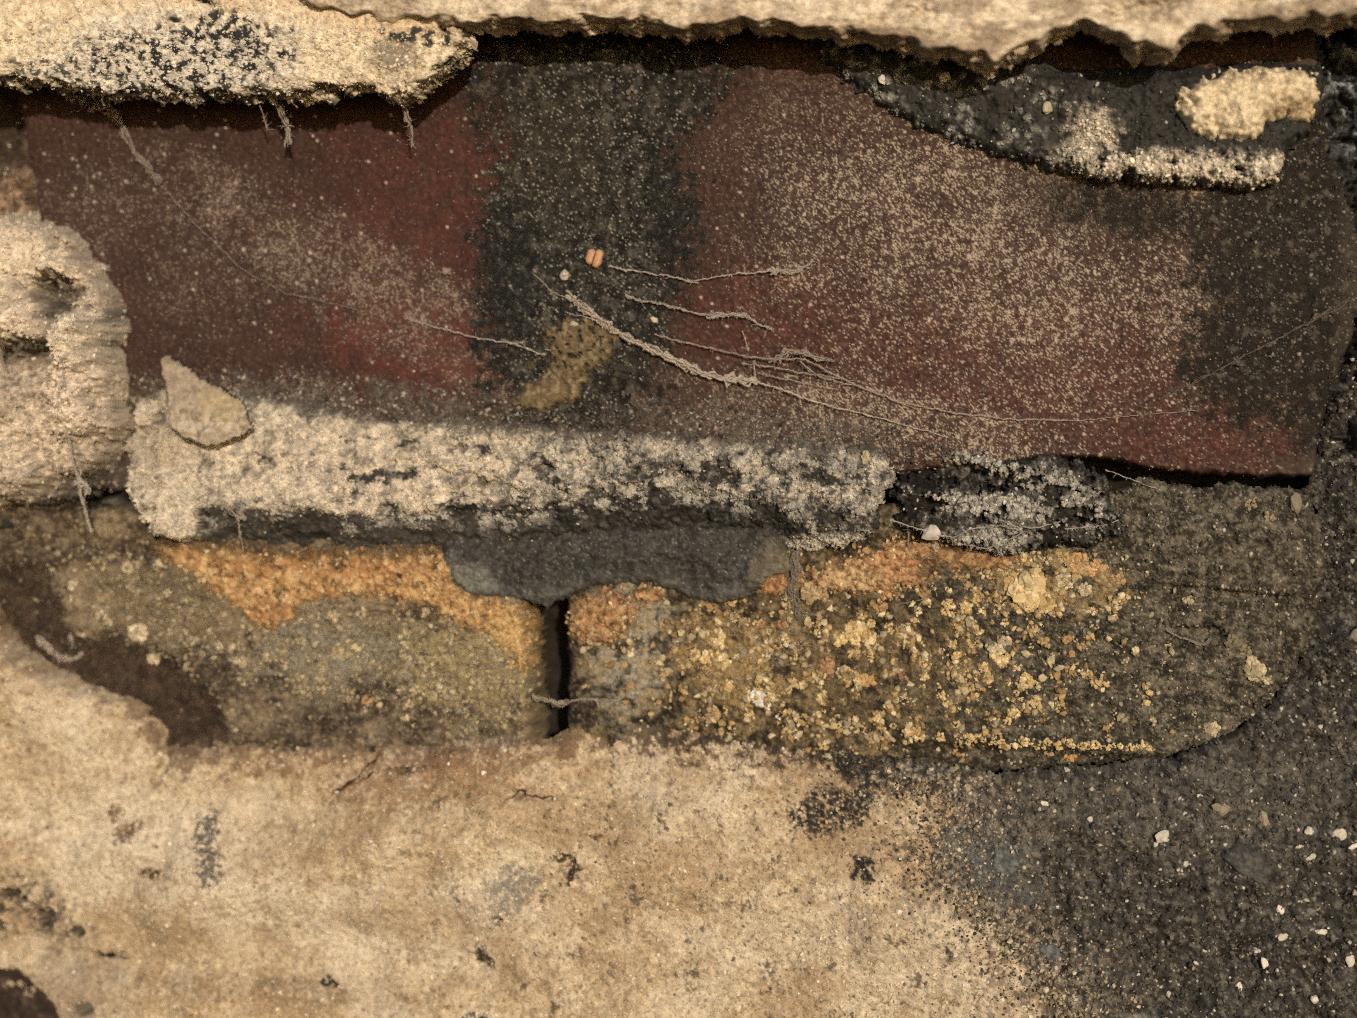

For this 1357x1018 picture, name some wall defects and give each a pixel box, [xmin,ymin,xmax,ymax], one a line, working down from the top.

peeling [160,356,254,446]
efflorescence [1244,498,1277,522]
spalling [1290,492,1302,514]
efflorescence [1173,583,1202,612]
spalling [0,560,228,750]
water stain [50,543,548,743]
efflorescence [565,541,1175,763]
efflorescence [1224,633,1273,685]
efflorescence [1191,711,1221,738]
water stain [940,823,1044,911]